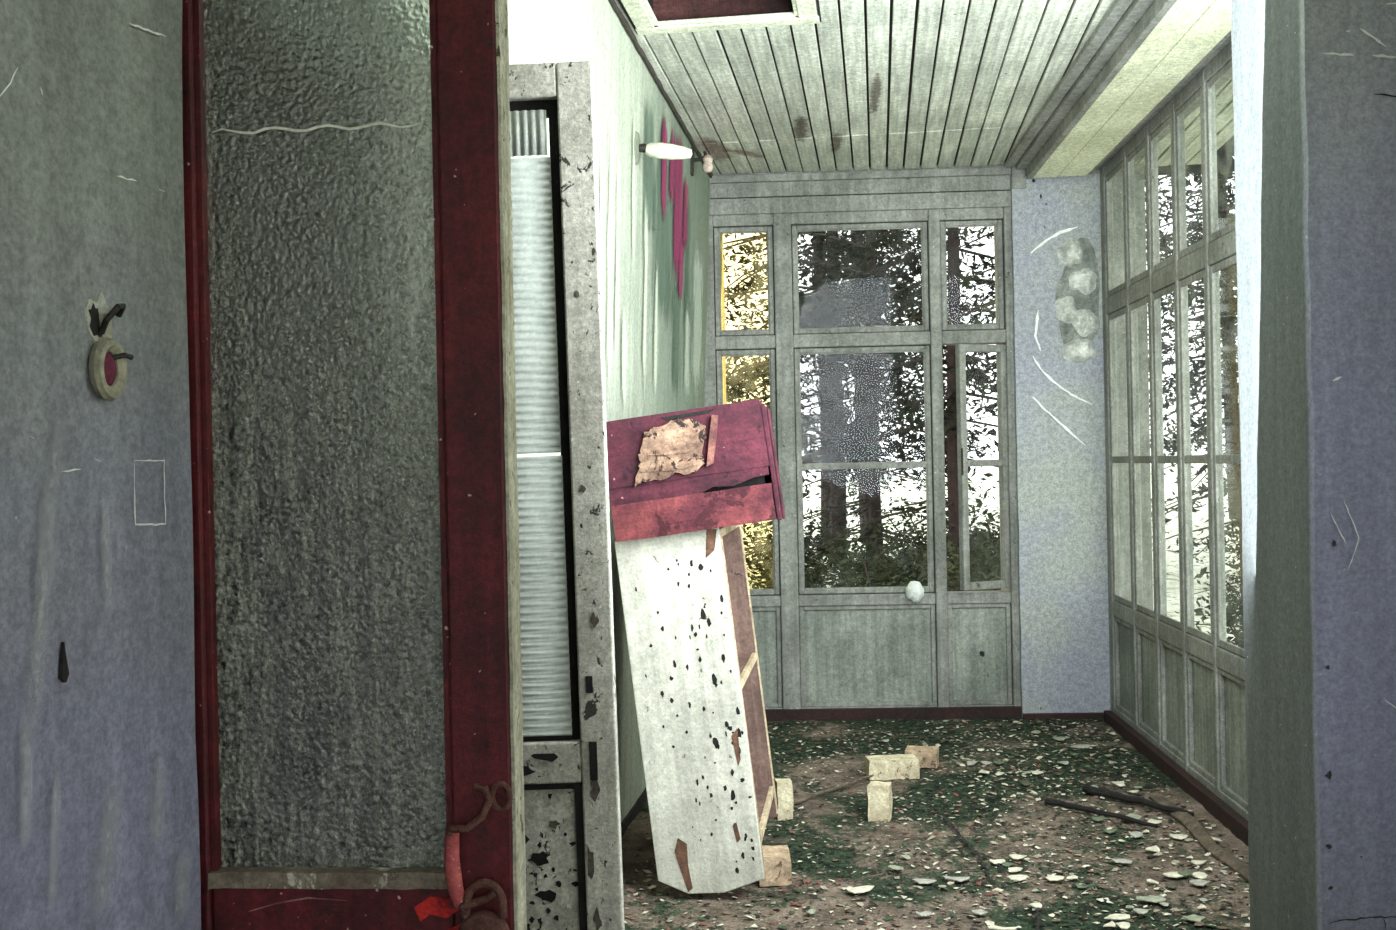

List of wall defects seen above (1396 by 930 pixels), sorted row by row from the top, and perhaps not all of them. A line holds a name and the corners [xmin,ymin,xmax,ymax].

crack [1329,916,1396,930]